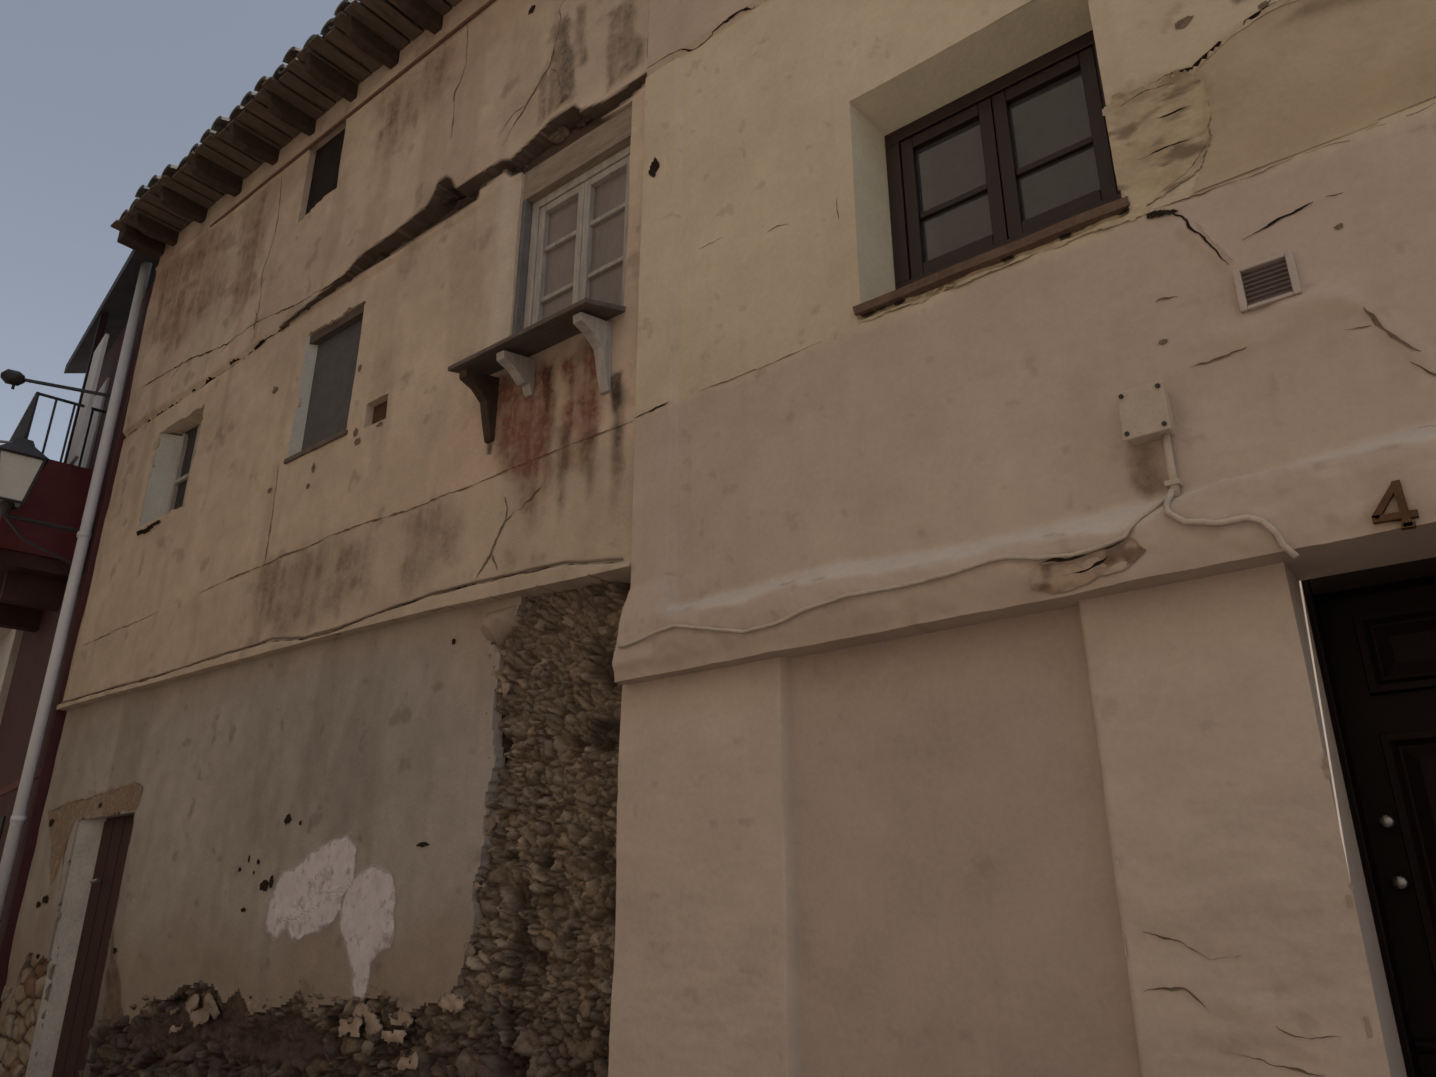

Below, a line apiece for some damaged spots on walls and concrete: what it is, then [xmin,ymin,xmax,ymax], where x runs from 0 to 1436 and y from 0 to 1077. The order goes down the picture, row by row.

crack [451,25,468,135]
crack [1154,0,1296,82]
spalling [857,68,1212,325]
crack [1146,103,1434,265]
crack [1346,307,1436,376]
corrosion [496,347,597,476]
crack [71,341,822,701]
spalling [1028,537,1146,594]
peeling [36,782,143,908]
spalling [78,579,631,1077]